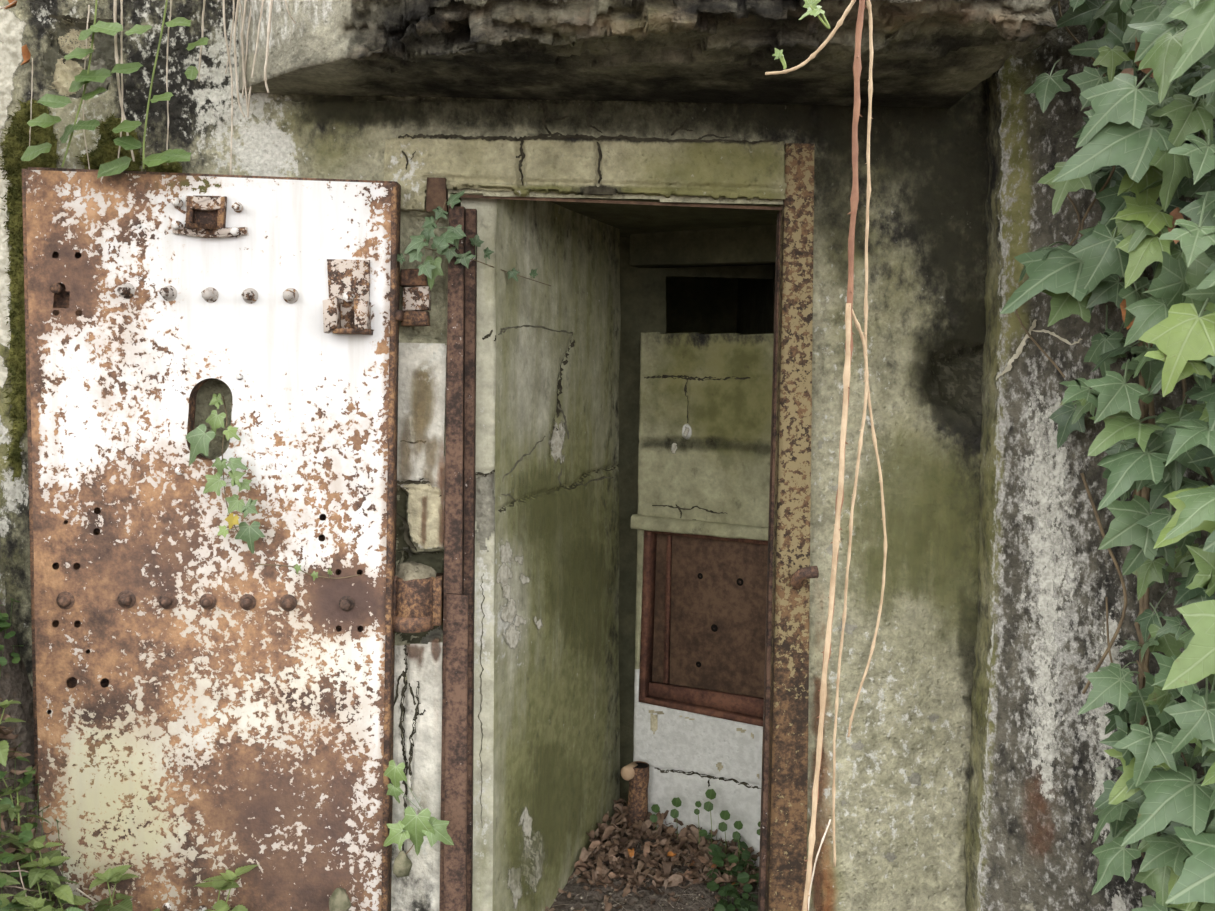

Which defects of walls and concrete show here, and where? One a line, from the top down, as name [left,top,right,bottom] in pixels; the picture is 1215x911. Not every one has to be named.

crack [398,104,779,185]
water stain [815,94,988,410]
water stain [0,415,11,445]
crack [476,325,616,512]
crack [645,375,750,423]
water stain [0,471,29,537]
crack [652,505,727,520]
crack [394,645,426,851]
rust [812,678,823,911]